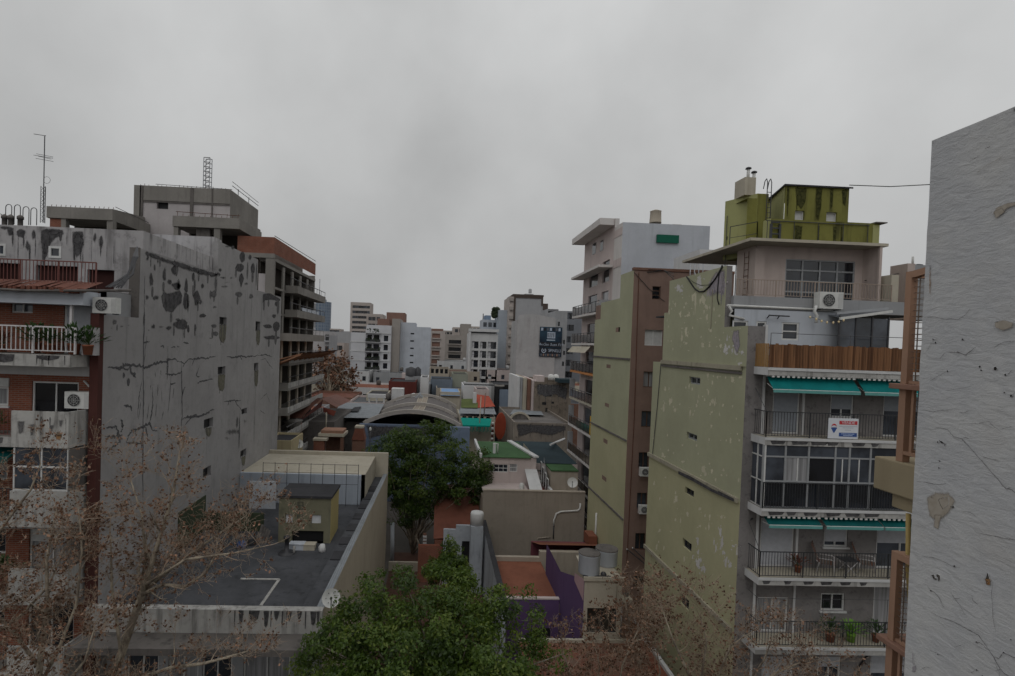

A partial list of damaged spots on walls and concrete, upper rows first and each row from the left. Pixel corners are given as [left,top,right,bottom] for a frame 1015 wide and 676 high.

water stain [1,226,103,266]
crack [106,280,273,477]
water stain [143,246,280,347]
peeling [668,266,744,427]
crack [925,310,1015,493]
water stain [234,610,320,628]
crack [924,583,1015,676]